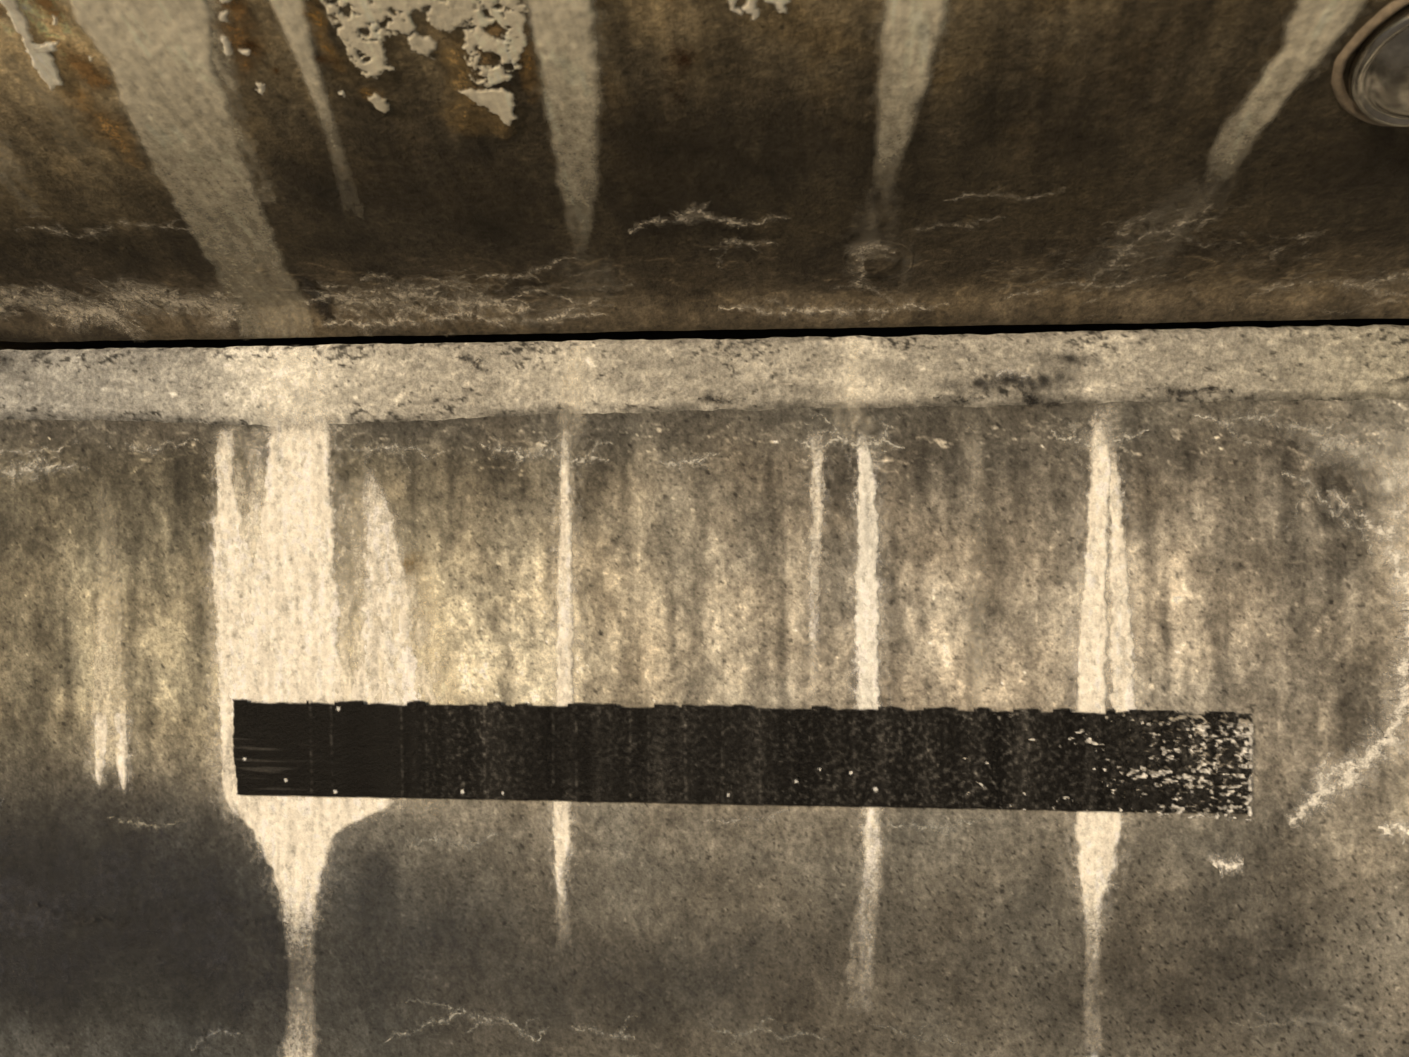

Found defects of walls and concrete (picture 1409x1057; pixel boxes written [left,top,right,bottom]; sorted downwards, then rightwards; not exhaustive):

leakage [70,0,258,218]
peeling [219,0,250,56]
peeling [307,0,530,126]
peeling [729,0,791,20]
crack [629,209,772,245]
crack [933,385,1149,448]
crack [1145,387,1332,443]
leakage [211,419,450,940]
leakage [854,438,885,710]
leakage [1075,423,1137,732]
crack [1282,462,1409,824]
leakage [1075,808,1123,941]